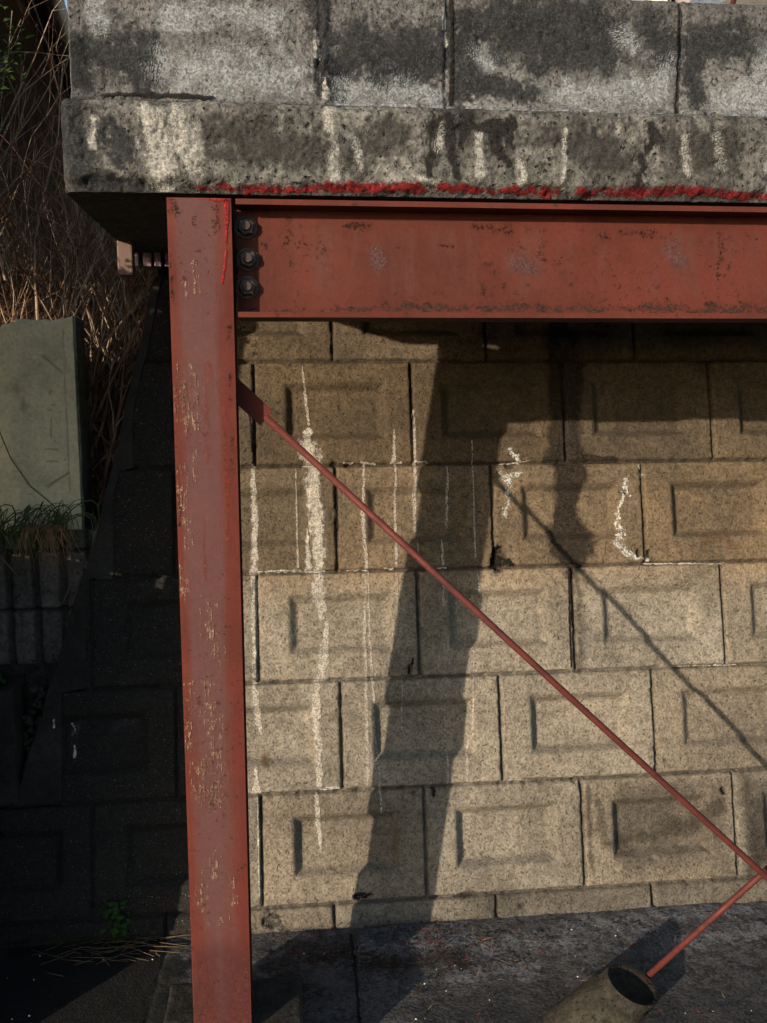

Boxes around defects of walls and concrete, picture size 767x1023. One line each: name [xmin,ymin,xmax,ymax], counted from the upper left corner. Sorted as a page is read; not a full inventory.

damp [89,115,97,150]
damp [137,102,203,192]
damp [322,107,341,184]
damp [352,137,363,169]
damp [415,110,527,184]
damp [633,121,664,189]
damp [681,134,691,176]
damp [542,322,618,575]
efflorescence [384,409,428,653]
efflorescence [250,366,340,852]
efflorescence [343,462,383,814]
efflorescence [251,766,262,897]